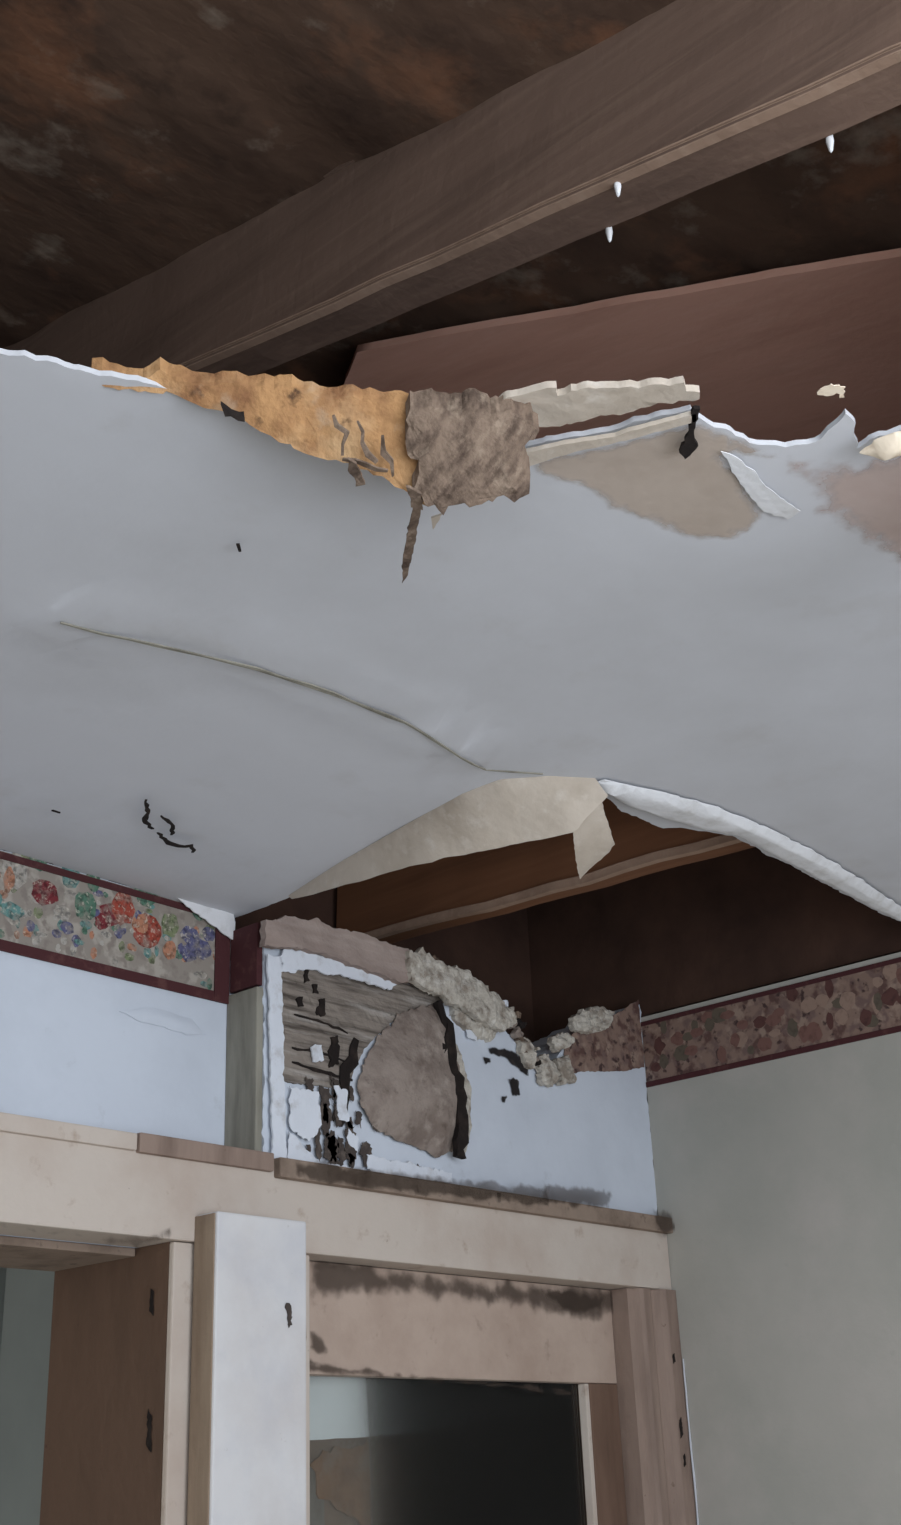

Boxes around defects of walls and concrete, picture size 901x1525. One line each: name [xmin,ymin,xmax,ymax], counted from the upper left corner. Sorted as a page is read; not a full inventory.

peeling [221,401,245,422]
peeling [540,428,757,537]
crack [60,621,543,775]
peeling [266,954,453,1183]
spalling [405,947,615,1088]
peeling [285,1303,307,1339]
peeling [310,1438,359,1525]